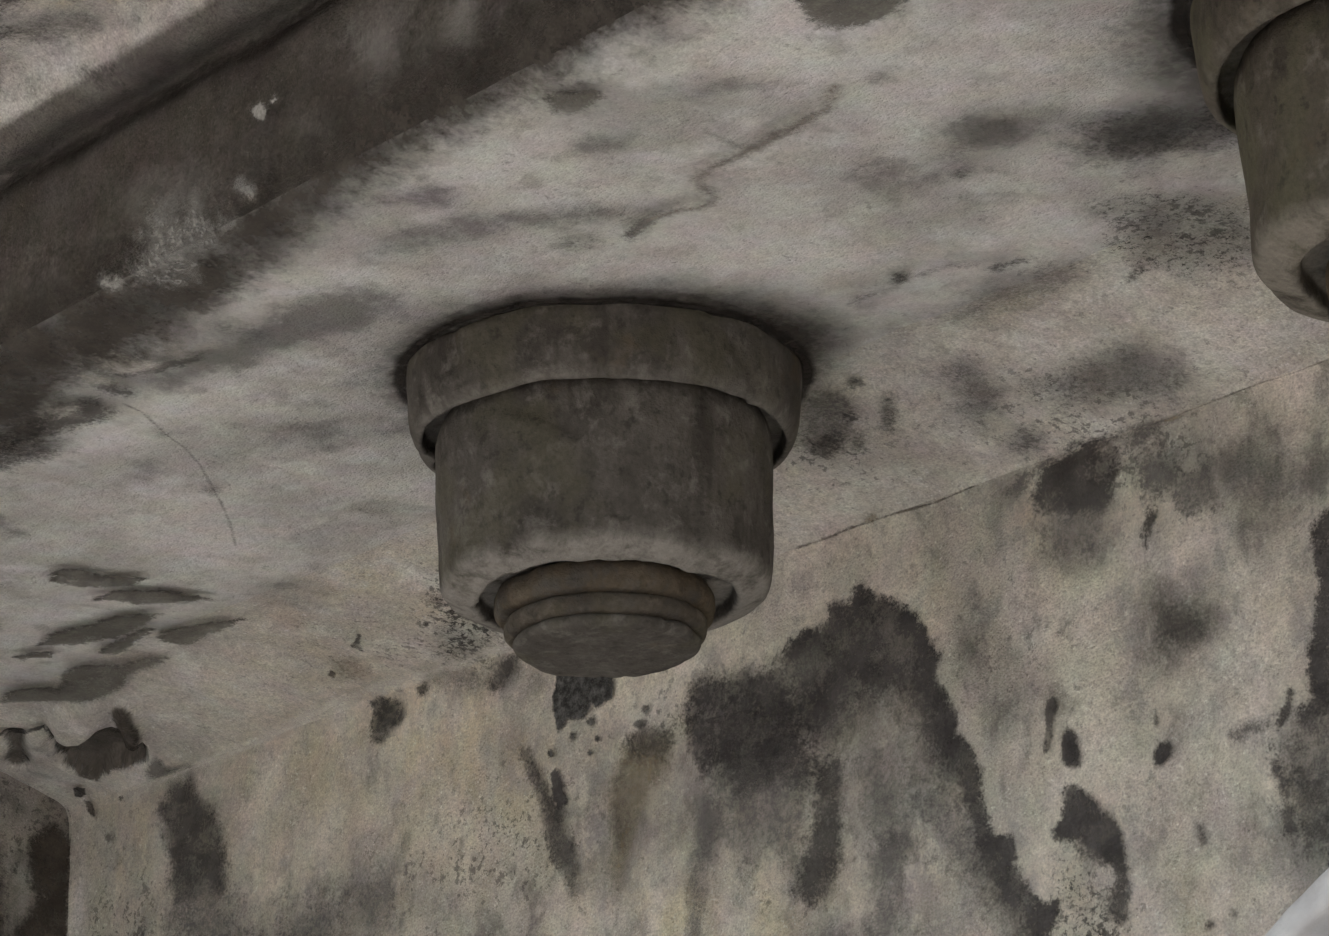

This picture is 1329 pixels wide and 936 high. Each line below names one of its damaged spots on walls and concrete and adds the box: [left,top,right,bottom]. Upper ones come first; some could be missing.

crack [625,85,838,239]
damp [1006,422,1218,563]
damp [0,822,71,936]
damp [158,777,382,936]
damp [518,748,578,893]
damp [609,583,1131,936]
damp [1228,509,1329,865]